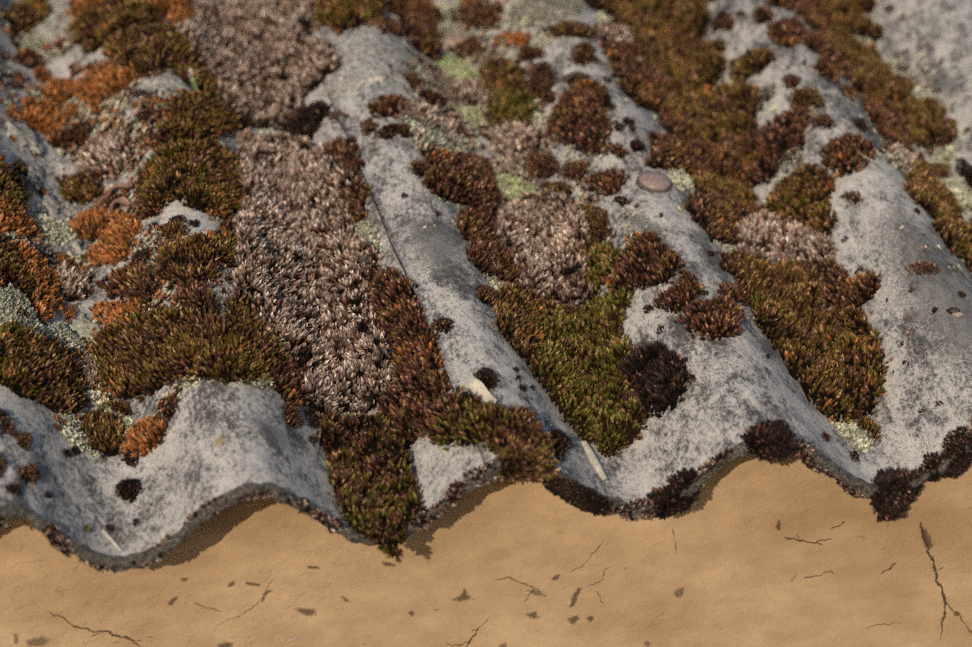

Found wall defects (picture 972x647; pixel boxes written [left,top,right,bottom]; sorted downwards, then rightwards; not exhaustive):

crack [50,612,142,647]
crack [920,523,947,639]